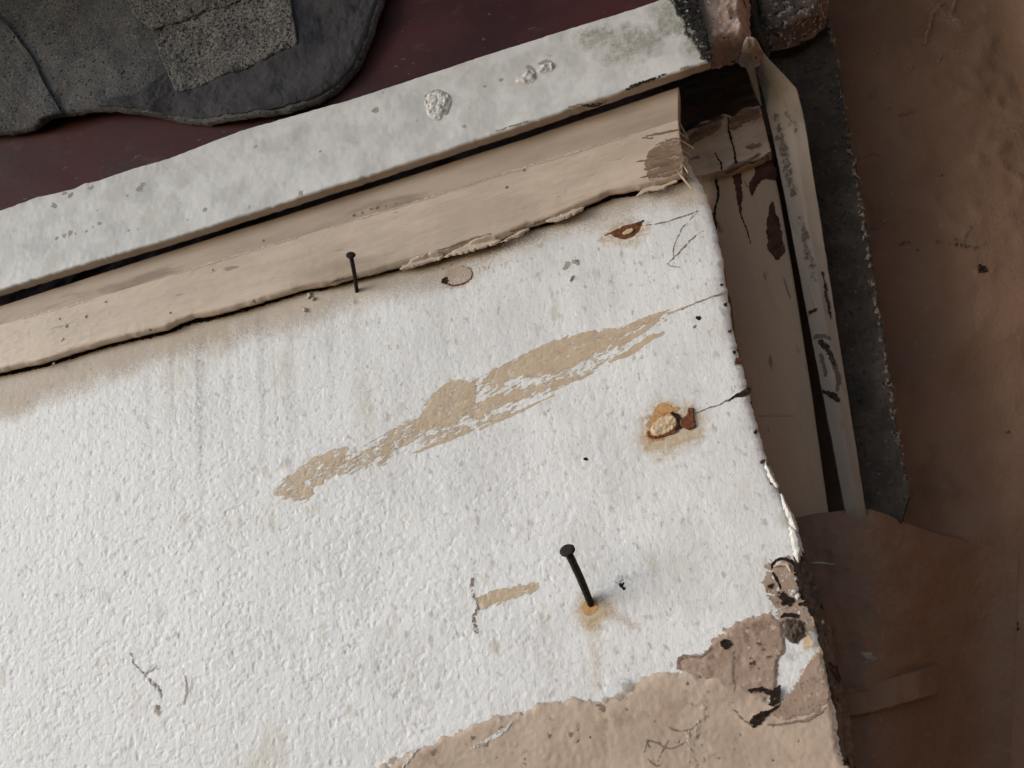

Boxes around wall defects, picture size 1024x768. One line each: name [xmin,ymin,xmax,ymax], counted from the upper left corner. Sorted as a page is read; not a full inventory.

peeling [400,207,584,270]
corrosion [600,220,644,242]
crack [646,210,704,268]
peeling [712,179,720,230]
peeling [732,156,778,243]
peeling [766,201,786,260]
corrosion [438,263,473,288]
peeling [274,318,646,502]
corrosion [640,401,704,450]
peeling [475,582,538,610]
corrosion [579,599,608,630]
peeling [676,459,829,721]